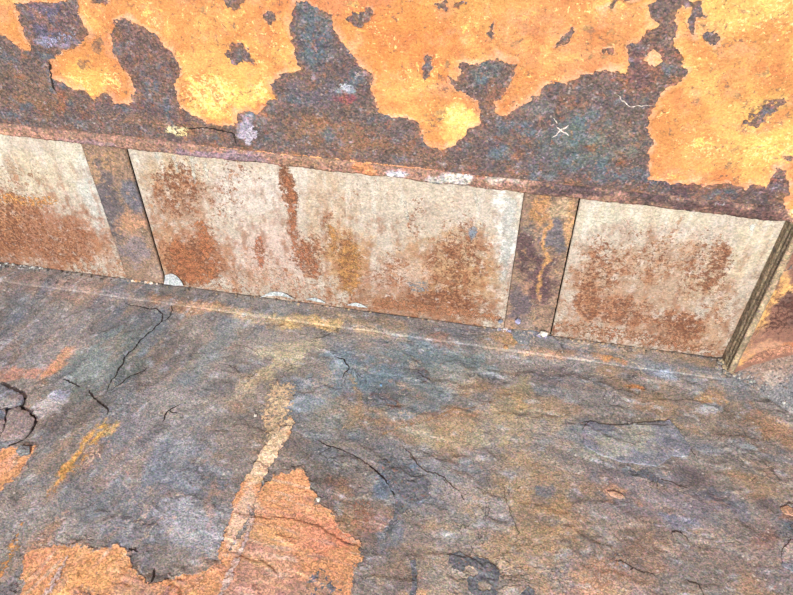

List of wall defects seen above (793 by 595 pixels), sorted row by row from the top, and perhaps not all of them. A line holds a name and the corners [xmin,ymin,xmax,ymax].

corrosion [163,170,322,294]
corrosion [327,224,362,295]
crack [63,301,173,414]
corrosion [558,323,712,355]
crack [0,387,38,446]